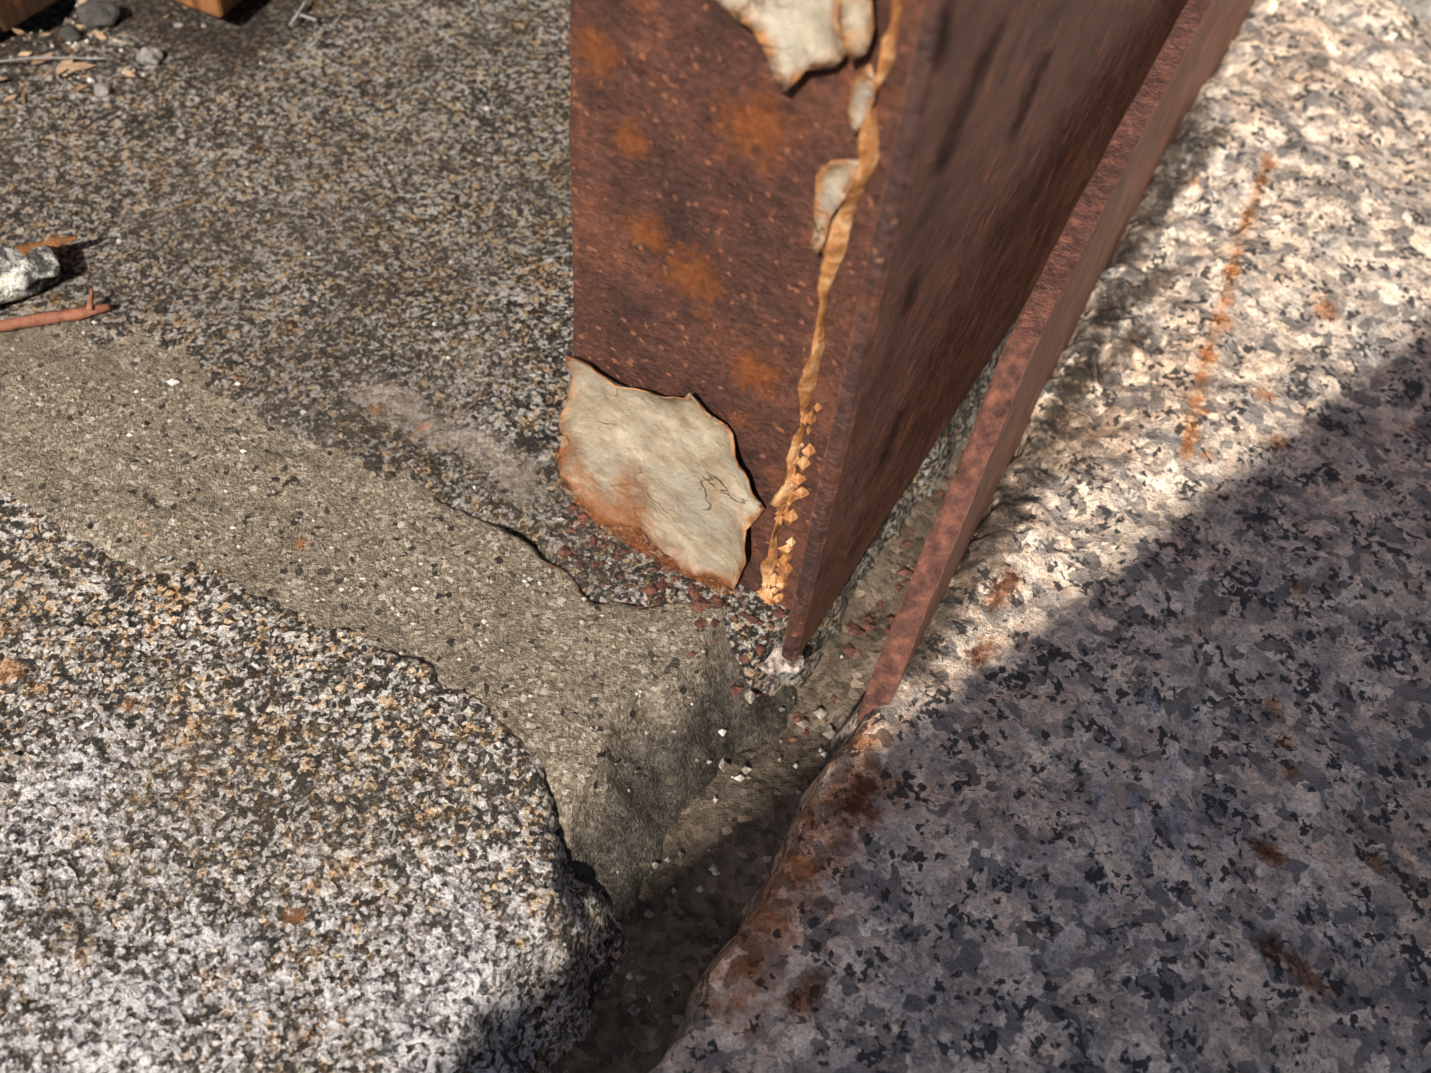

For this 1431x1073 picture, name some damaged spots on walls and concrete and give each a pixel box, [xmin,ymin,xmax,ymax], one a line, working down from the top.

peeling [717,0,877,134]
peeling [809,159,860,256]
corrosion [756,0,904,606]
peeling [558,355,765,592]
corrosion [982,569,1025,611]
corrosion [963,637,998,667]
corrosion [834,775,882,830]
corrosion [790,967,831,1022]